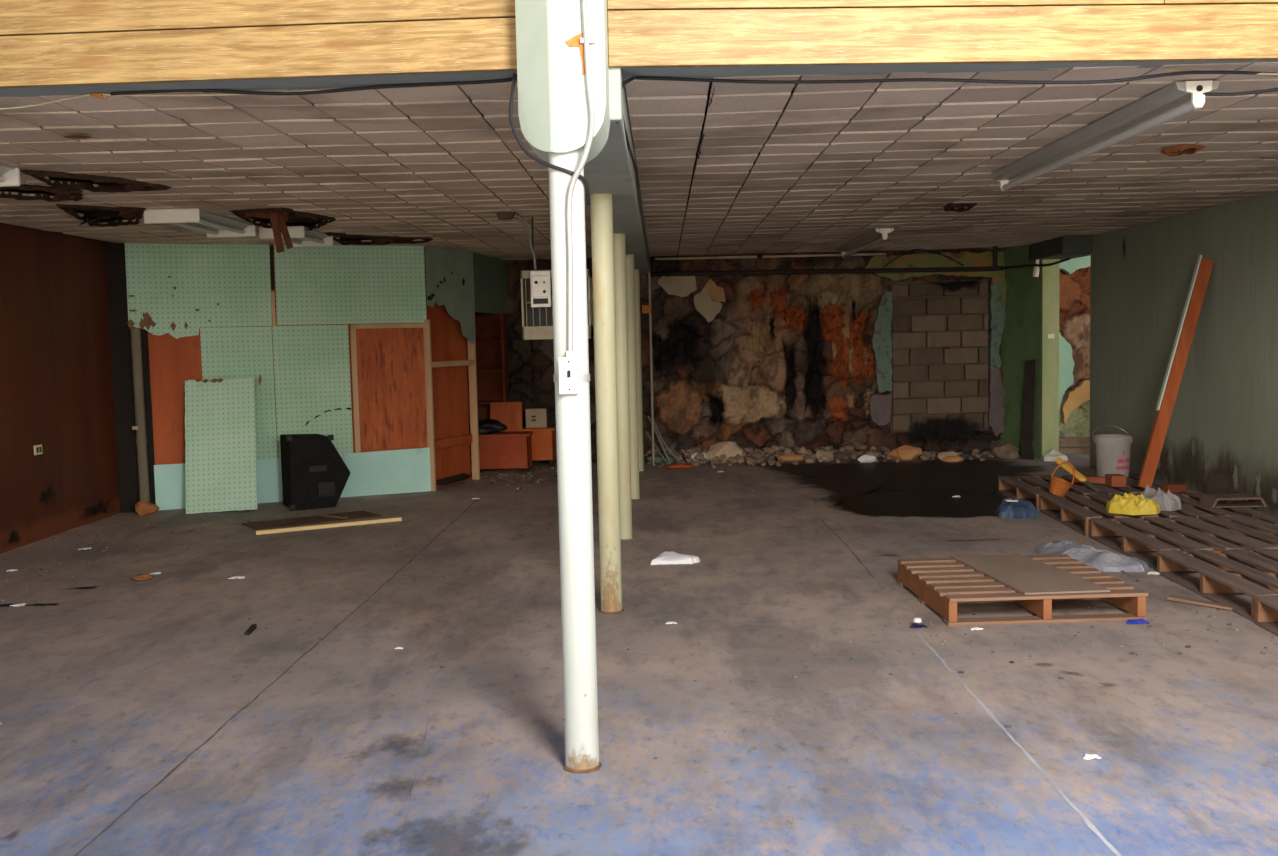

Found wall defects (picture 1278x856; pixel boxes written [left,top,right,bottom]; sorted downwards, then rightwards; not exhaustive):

peeling [127,295,156,331]
water stain [1156,440,1278,511]